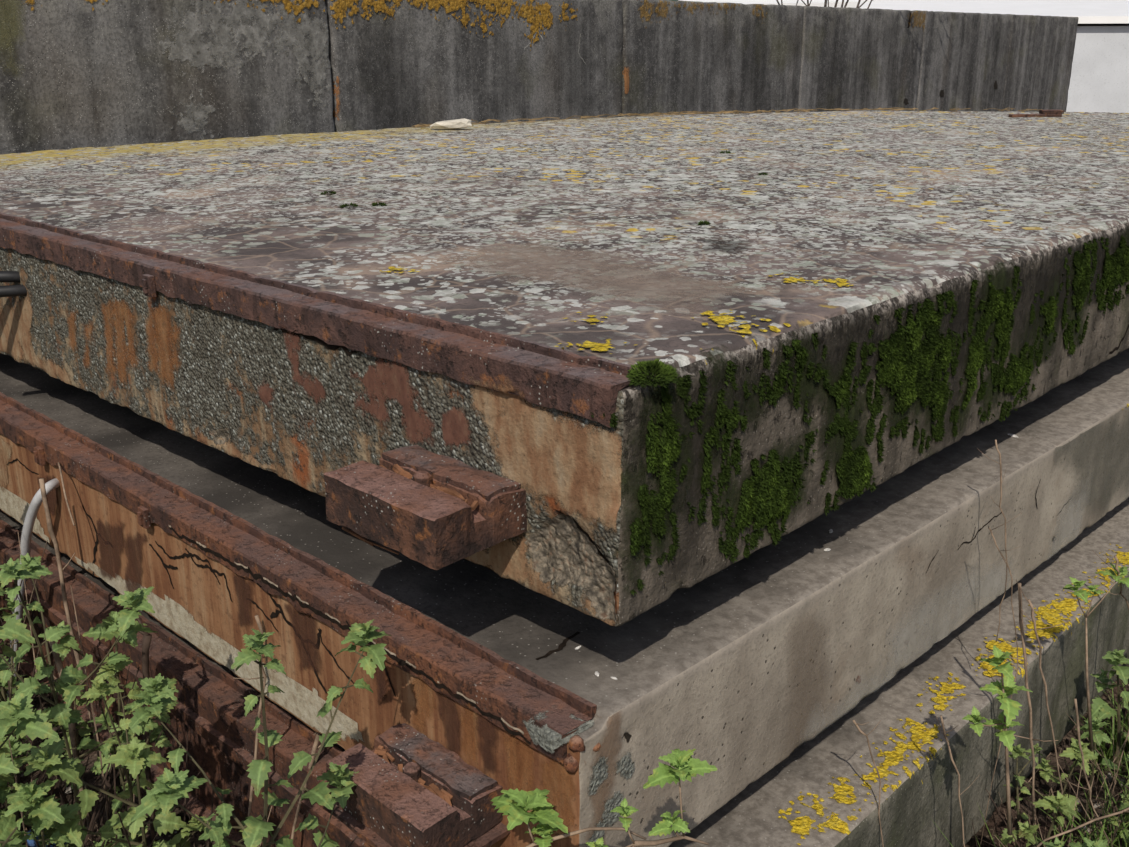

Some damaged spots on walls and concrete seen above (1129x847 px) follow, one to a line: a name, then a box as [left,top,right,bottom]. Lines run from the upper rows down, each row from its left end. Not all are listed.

rust [68,302,178,386]
rust [350,358,470,450]
crack [6,458,39,475]
rust [38,477,57,515]
crack [82,505,99,575]
rust [96,520,146,592]
crack [926,512,1002,573]
rust [234,575,253,626]
rust [285,605,320,672]
crack [149,525,531,745]
crack [536,631,580,660]